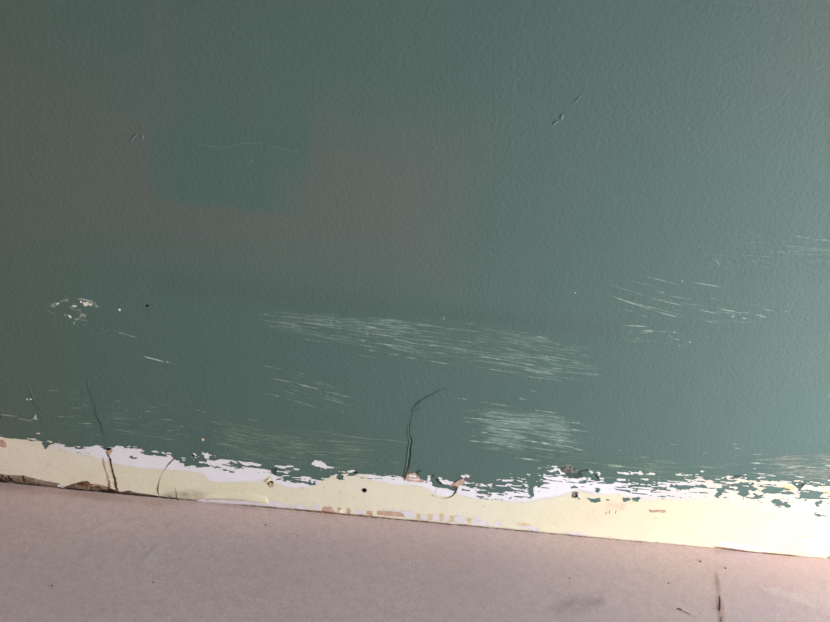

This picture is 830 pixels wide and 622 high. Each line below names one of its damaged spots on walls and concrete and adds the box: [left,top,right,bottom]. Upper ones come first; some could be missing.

crack [88,378,118,493]
crack [403,389,443,481]
peeling [0,433,830,559]